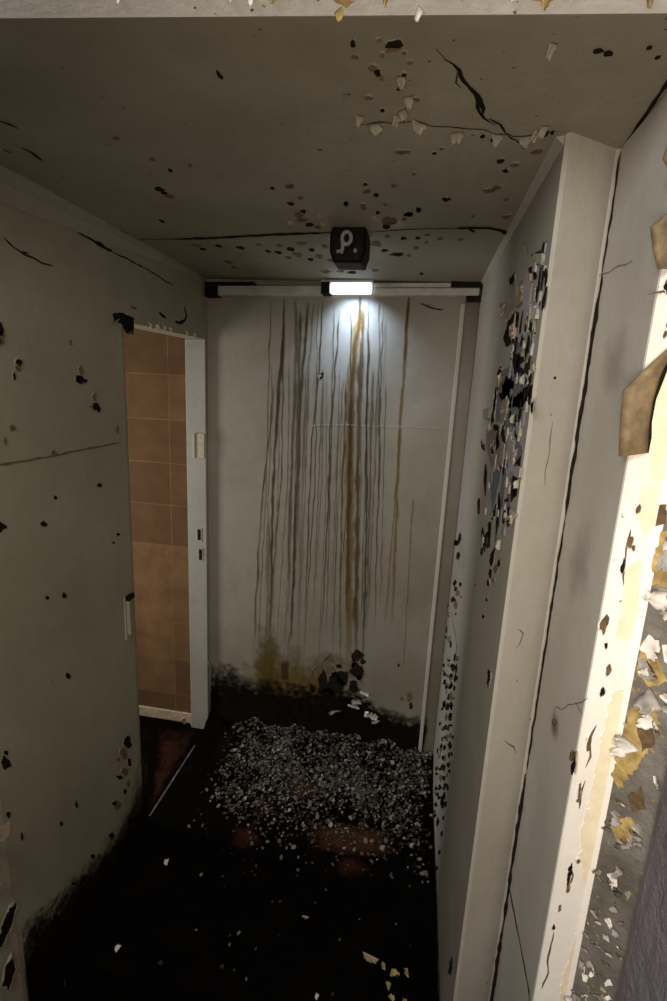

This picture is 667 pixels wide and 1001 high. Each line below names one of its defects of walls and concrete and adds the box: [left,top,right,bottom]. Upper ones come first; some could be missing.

peeling [414,4,425,22]
crack [362,49,556,143]
peeling [650,214,667,295]
crack [0,442,120,466]
damp [210,307,427,750]
rust [339,303,374,636]
rust [386,299,409,603]
peeling [474,241,548,602]
crack [490,80,667,1001]
peeling [0,900,18,992]
peeling [433,579,462,837]
peeling [551,635,667,1001]